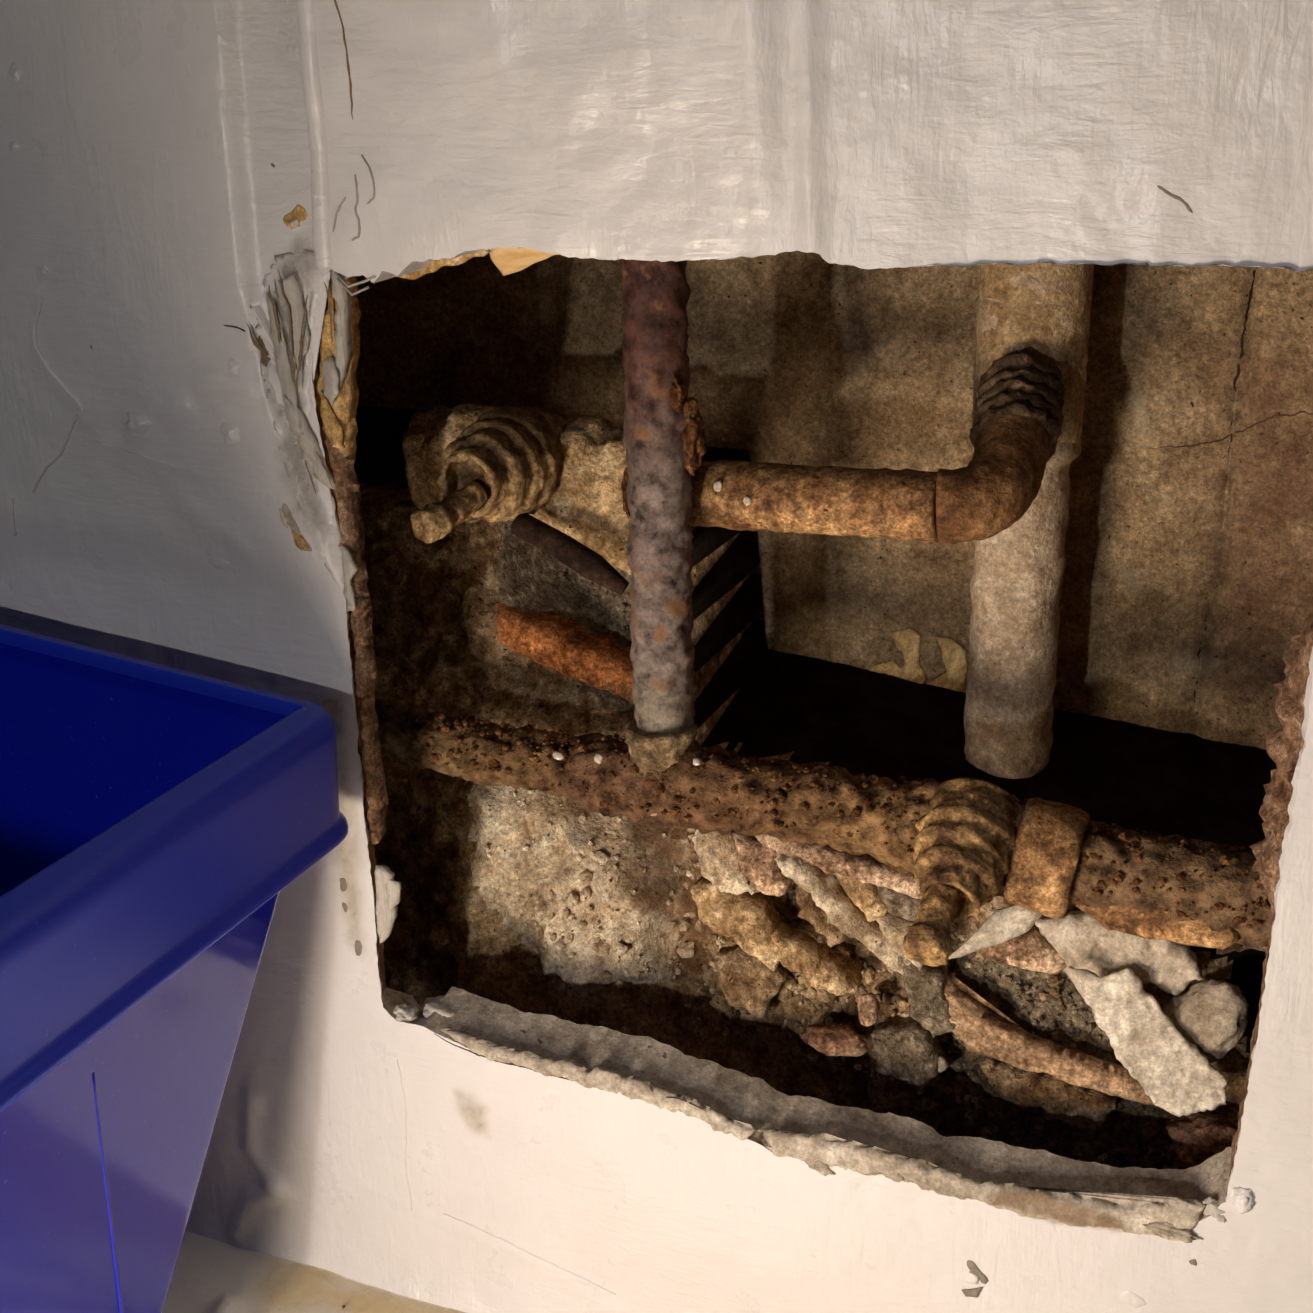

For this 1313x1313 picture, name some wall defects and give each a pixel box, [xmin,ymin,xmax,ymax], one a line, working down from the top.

rust [669,373,707,478]
rust [621,467,630,519]
peeling [246,249,389,846]
peeling [340,878,348,912]
peeling [374,865,401,943]
rust [675,851,709,972]
flaking render [949,905,1043,959]
rust [1076,903,1241,950]
flaking render [393,995,1255,1243]